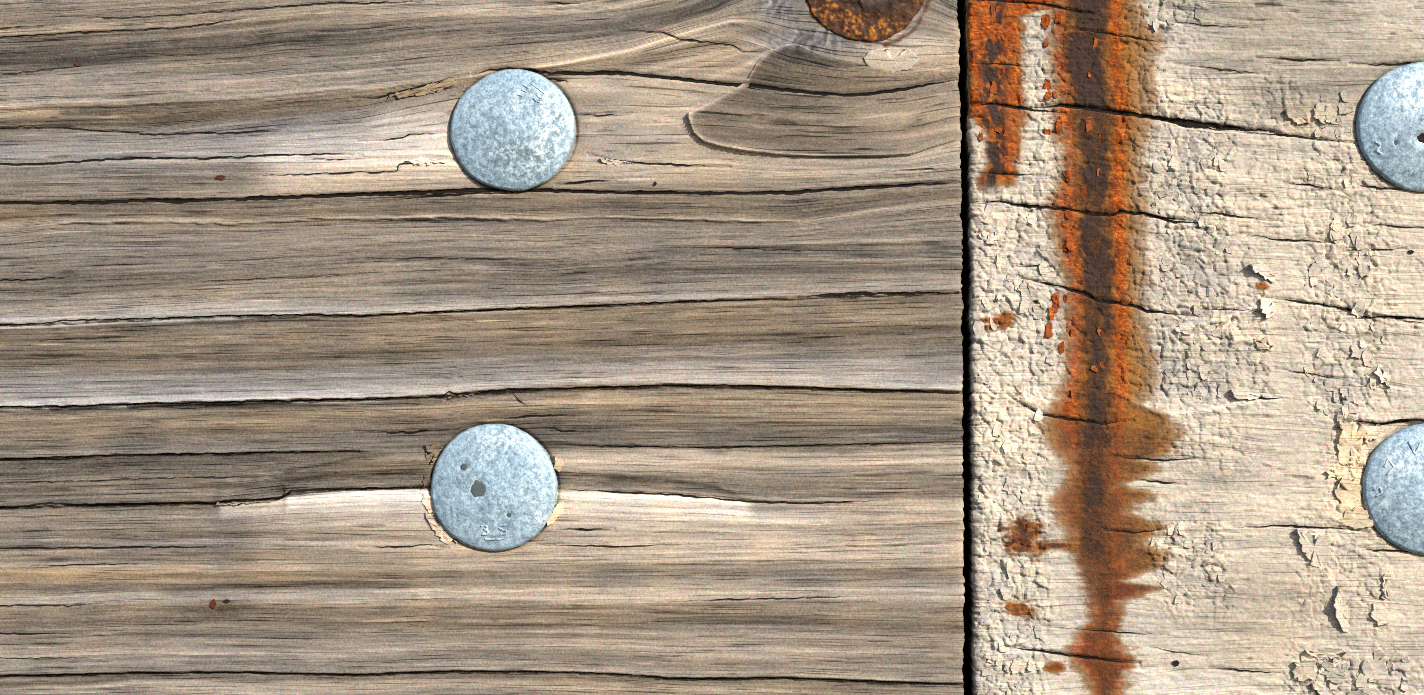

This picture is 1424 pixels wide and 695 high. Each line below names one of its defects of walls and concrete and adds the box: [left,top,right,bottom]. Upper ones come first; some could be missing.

crack [0,0,431,74]
crack [972,0,1412,75]
crack [354,30,1356,144]
crack [0,126,1424,251]
corrosion [966,0,1182,695]
peeling [1303,172,1390,530]
crack [1348,417,1424,425]
crack [0,546,222,566]
peeling [1296,529,1334,571]
crack [0,601,945,684]
peeling [1291,586,1410,695]
peeling [1370,574,1390,626]